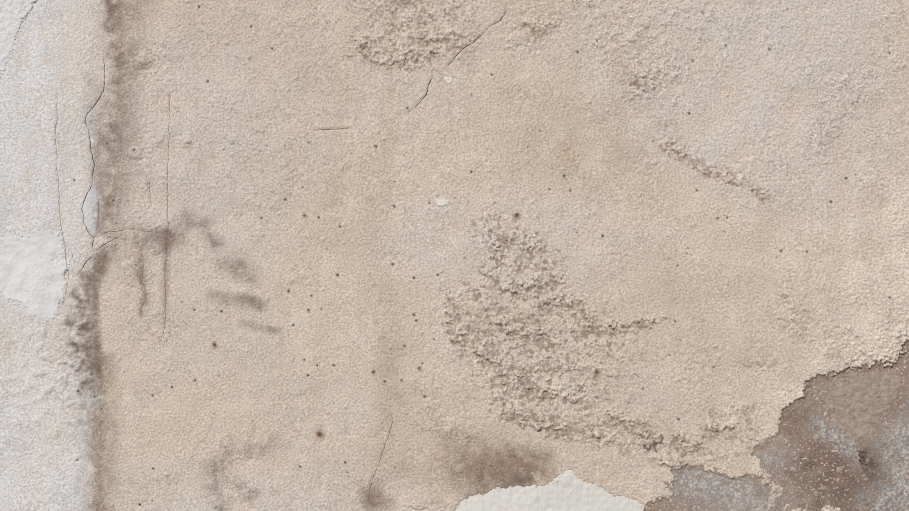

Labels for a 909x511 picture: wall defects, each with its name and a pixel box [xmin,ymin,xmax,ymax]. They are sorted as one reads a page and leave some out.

spalling [344,0,482,85]
crack [408,9,507,113]
peeling [82,176,99,236]
peeling [0,225,70,321]
leakage [72,256,105,312]
leakage [80,321,102,388]
spalling [436,201,909,511]